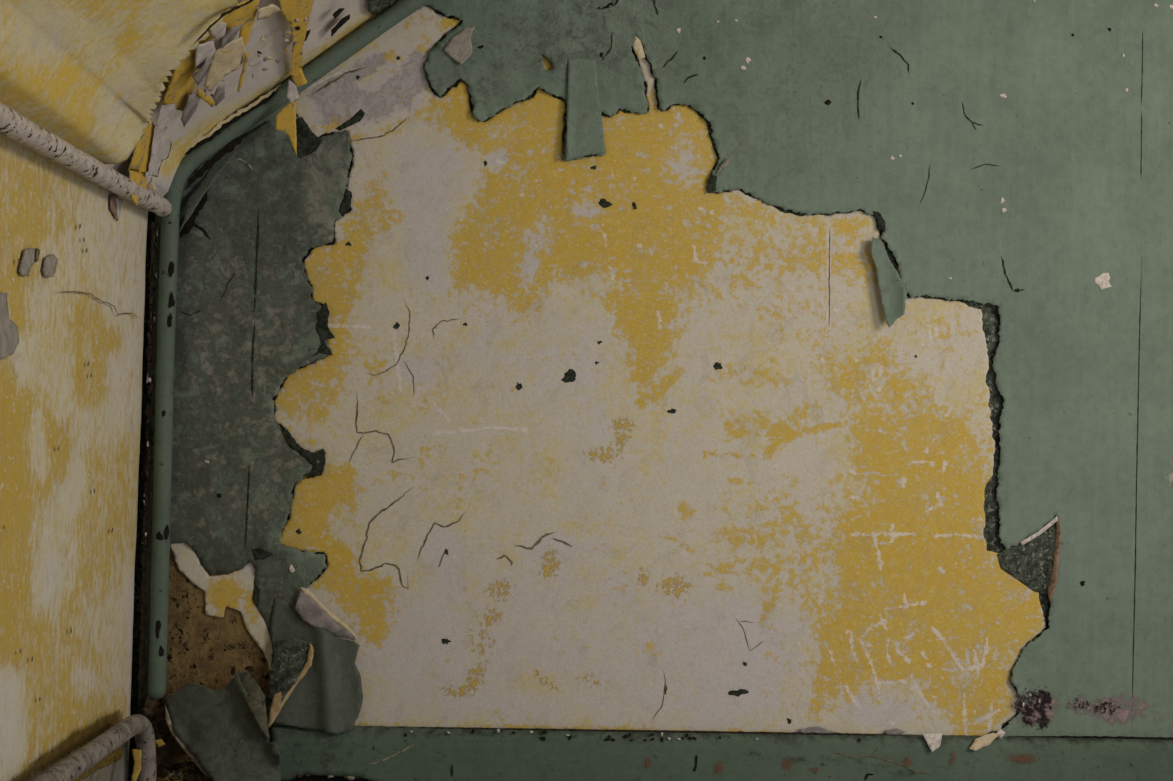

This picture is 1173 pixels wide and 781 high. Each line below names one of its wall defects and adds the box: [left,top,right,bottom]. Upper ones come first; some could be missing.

peeling [110,193,140,221]
spalling [18,248,58,277]
crack [349,298,457,463]
peeling [127,0,1062,778]
crack [359,487,464,589]
crack [496,532,572,566]
damp [1012,688,1155,731]